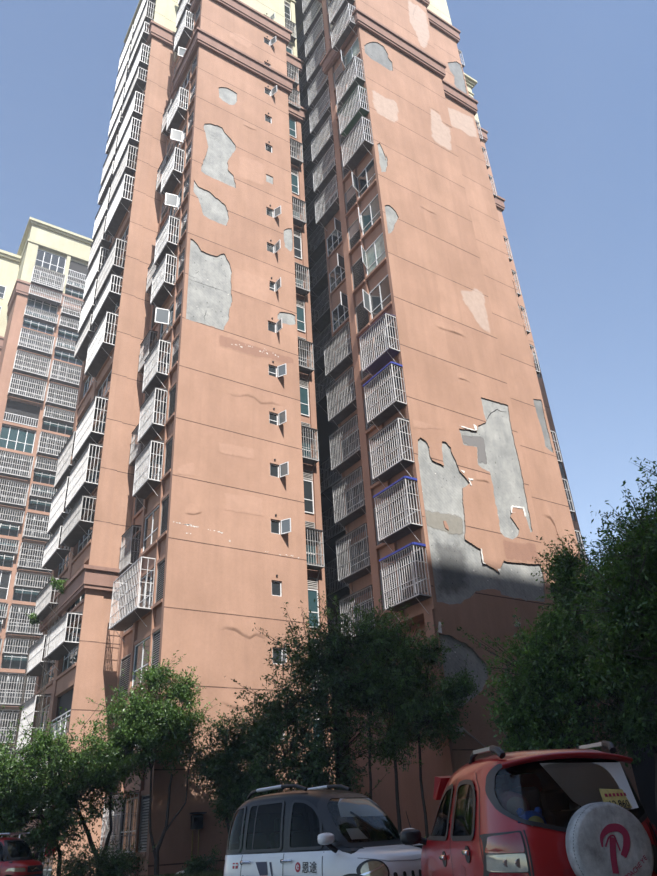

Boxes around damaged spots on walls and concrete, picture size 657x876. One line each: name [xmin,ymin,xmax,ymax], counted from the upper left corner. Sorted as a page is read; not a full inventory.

spalling [219,87,237,105]
spalling [364,42,393,71]
spalling [448,61,467,94]
spalling [201,123,236,188]
spalling [377,143,388,172]
spalling [193,180,229,226]
spalling [385,205,399,234]
spalling [186,239,232,330]
spalling [459,397,533,540]
spalling [418,437,546,604]
spalling [438,622,488,708]